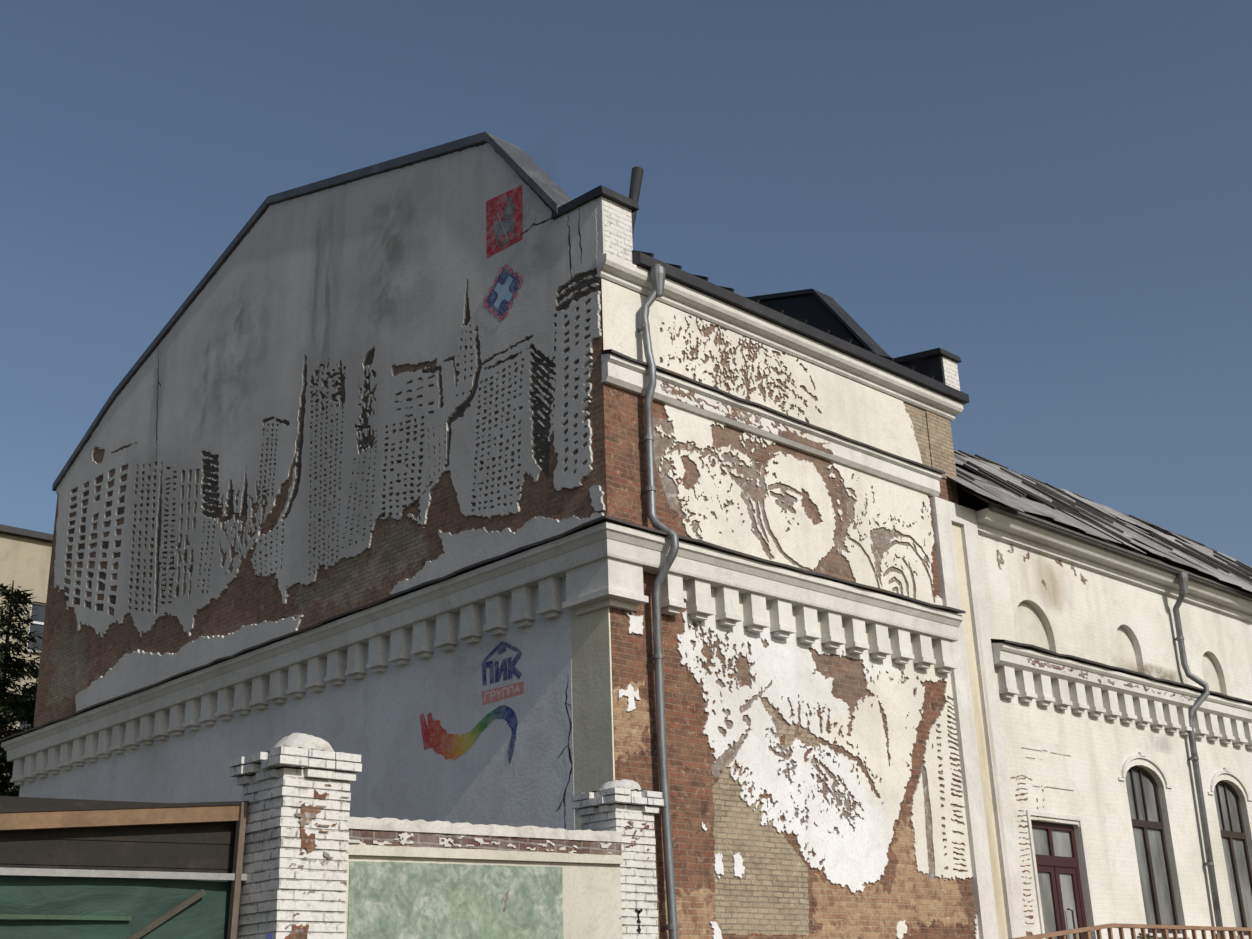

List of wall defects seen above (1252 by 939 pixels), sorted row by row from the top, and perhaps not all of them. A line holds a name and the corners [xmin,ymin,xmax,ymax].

crack [506,211,582,289]
spalling [33,290,941,728]
crack [555,683,572,828]
spalling [600,572,975,939]
spalling [290,784,392,901]
peeling [439,836,578,853]
spalling [285,913,309,939]